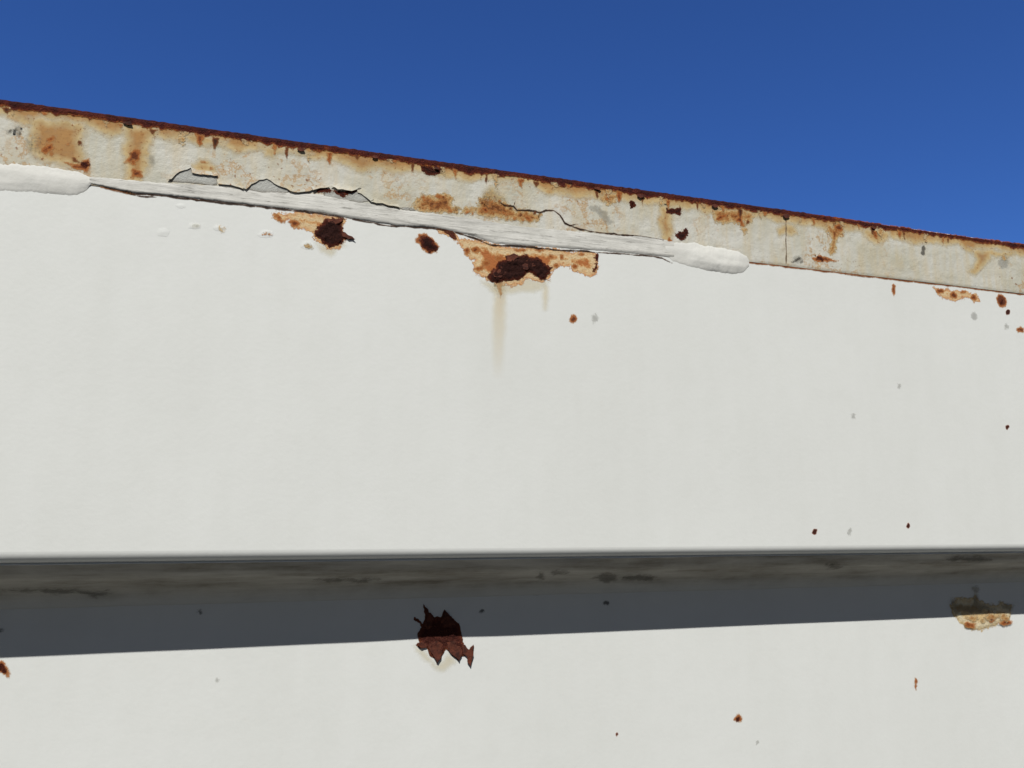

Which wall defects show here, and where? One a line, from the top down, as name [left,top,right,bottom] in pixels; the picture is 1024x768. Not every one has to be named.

peeling [168,164,414,210]
crack [109,188,668,261]
corrosion [0,99,1024,315]